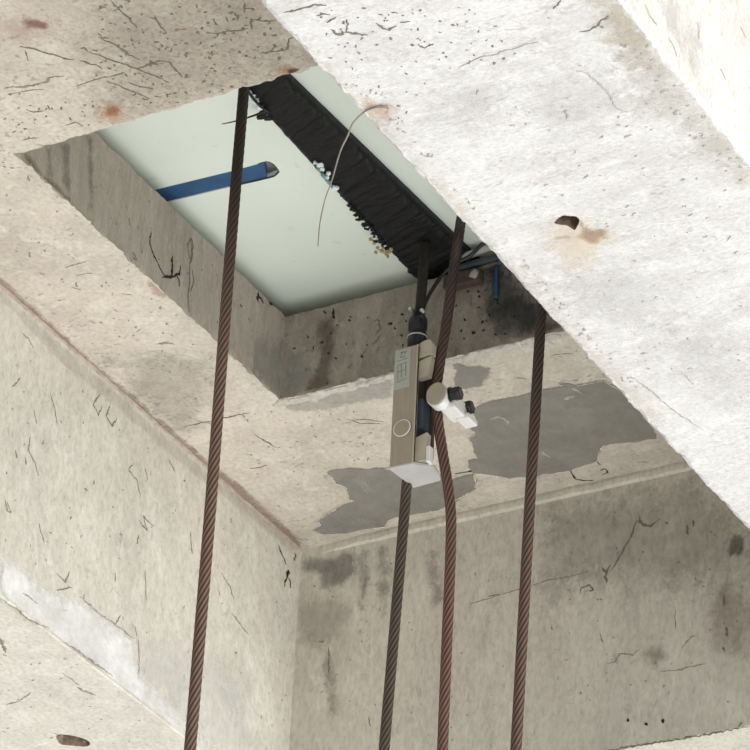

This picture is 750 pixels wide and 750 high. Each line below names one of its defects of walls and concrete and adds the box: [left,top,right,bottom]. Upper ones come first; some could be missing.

crack [4,33,183,113]
crack [129,232,194,306]
water stain [485,266,536,333]
spalling [555,215,602,255]
corrosion [584,229,604,242]
peeling [454,363,490,389]
peeling [313,377,656,535]
water stain [307,555,354,584]
crack [470,517,668,604]
water stain [0,557,186,734]